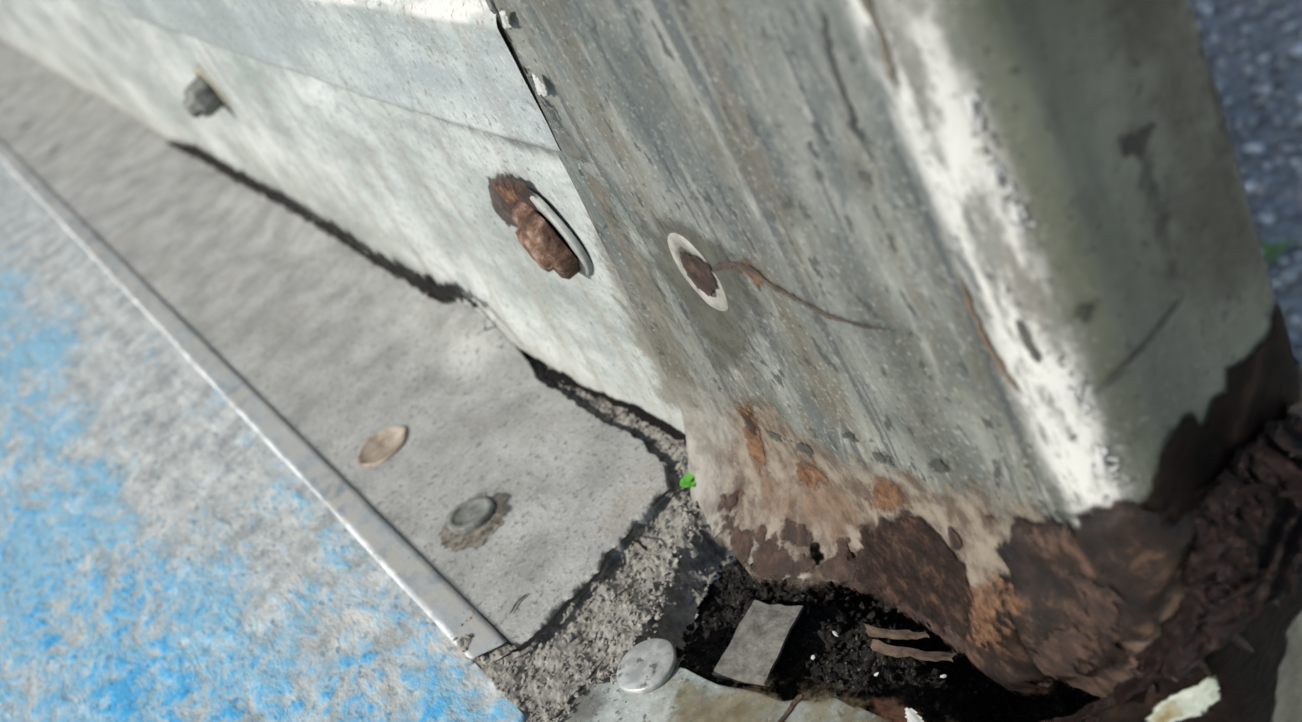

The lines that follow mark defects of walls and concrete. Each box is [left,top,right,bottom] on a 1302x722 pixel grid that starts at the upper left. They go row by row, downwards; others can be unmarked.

corrosion [486,173,546,228]
peeling [1057,352,1119,485]
corrosion [717,399,1044,662]
peeling [1146,660,1220,722]